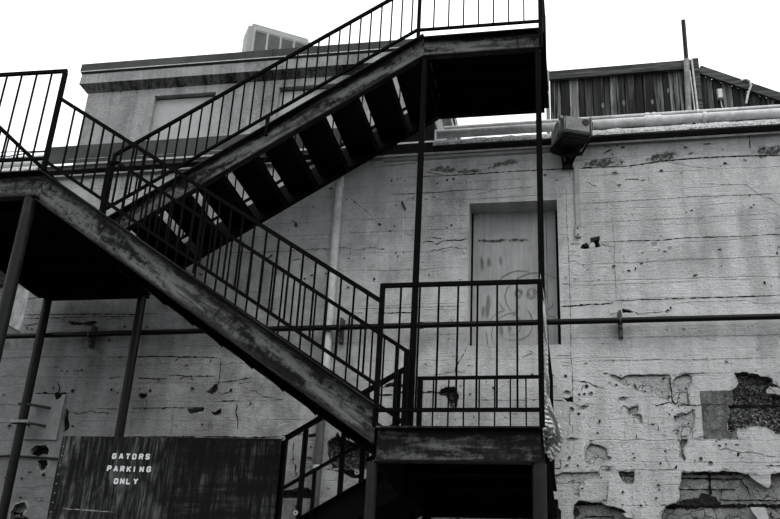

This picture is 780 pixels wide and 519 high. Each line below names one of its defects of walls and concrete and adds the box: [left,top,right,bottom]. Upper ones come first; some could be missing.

crack [377,135,780,470]
spalling [9,496,44,519]
spalling [20,445,53,480]
crack [0,356,311,475]
spalling [564,385,593,415]
spalling [555,417,641,519]
crack [581,430,695,502]
spalling [603,369,780,519]